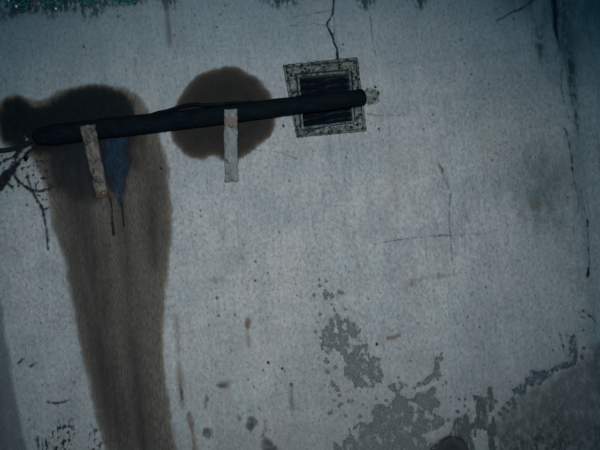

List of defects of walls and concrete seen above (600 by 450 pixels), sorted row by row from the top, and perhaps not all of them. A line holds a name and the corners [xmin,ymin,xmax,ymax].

crack [326,0,339,69]
water stain [173,67,271,111]
water stain [171,124,225,160]
water stain [237,118,275,159]
crack [0,139,54,250]
water stain [0,85,175,450]
peeling [312,279,586,450]